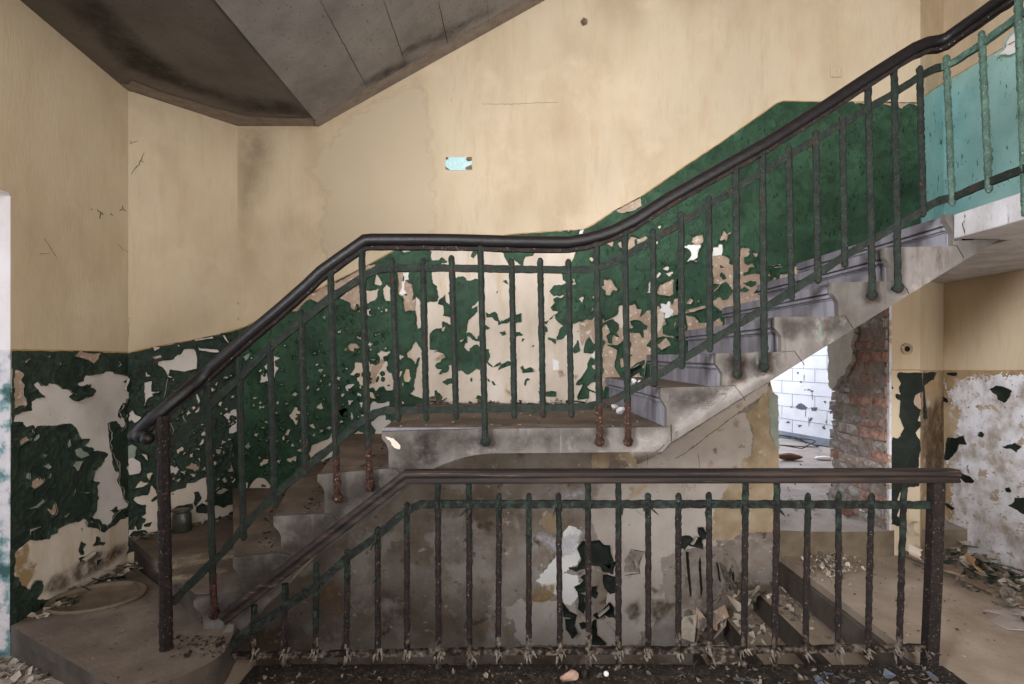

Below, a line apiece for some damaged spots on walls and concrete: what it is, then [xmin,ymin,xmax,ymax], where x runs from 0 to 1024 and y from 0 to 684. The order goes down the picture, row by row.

damp [48,547,122,591]
peeling [10,333,231,606]
peeling [170,223,788,523]
peeling [506,483,774,665]
peeling [591,308,1024,574]